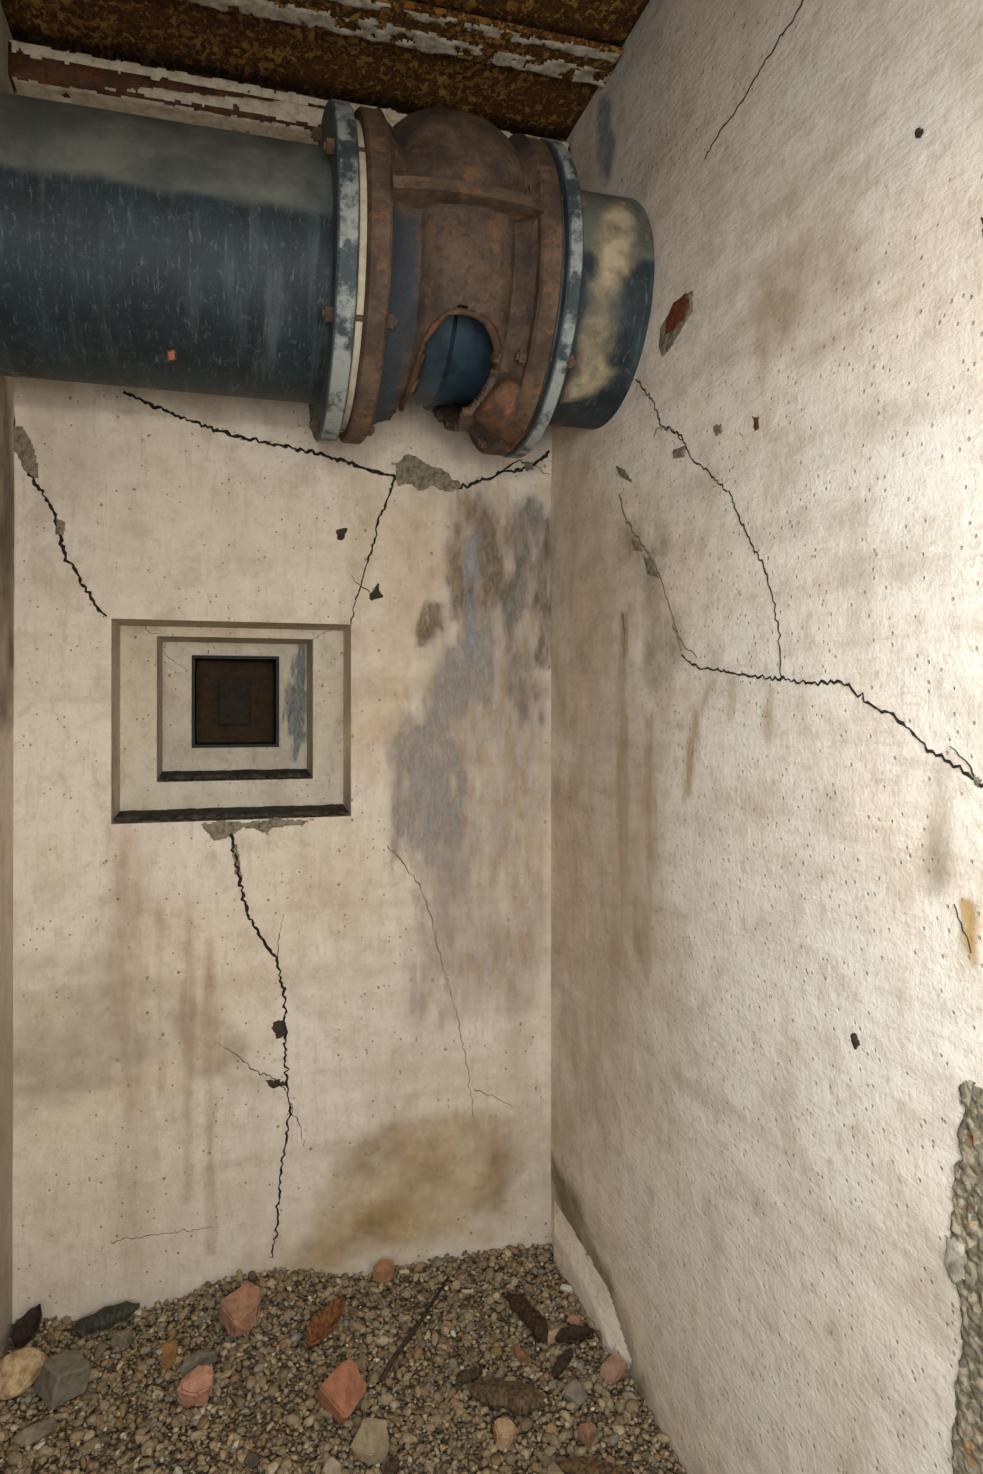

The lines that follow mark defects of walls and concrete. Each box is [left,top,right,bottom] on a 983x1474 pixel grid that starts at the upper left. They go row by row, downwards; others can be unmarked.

crack [704,0,803,160]
crack [27,466,107,616]
crack [123,390,396,640]
damp [393,498,551,915]
crack [459,450,550,489]
crack [619,379,983,788]
crack [225,833,305,1258]
spalling [944,1079,983,1474]